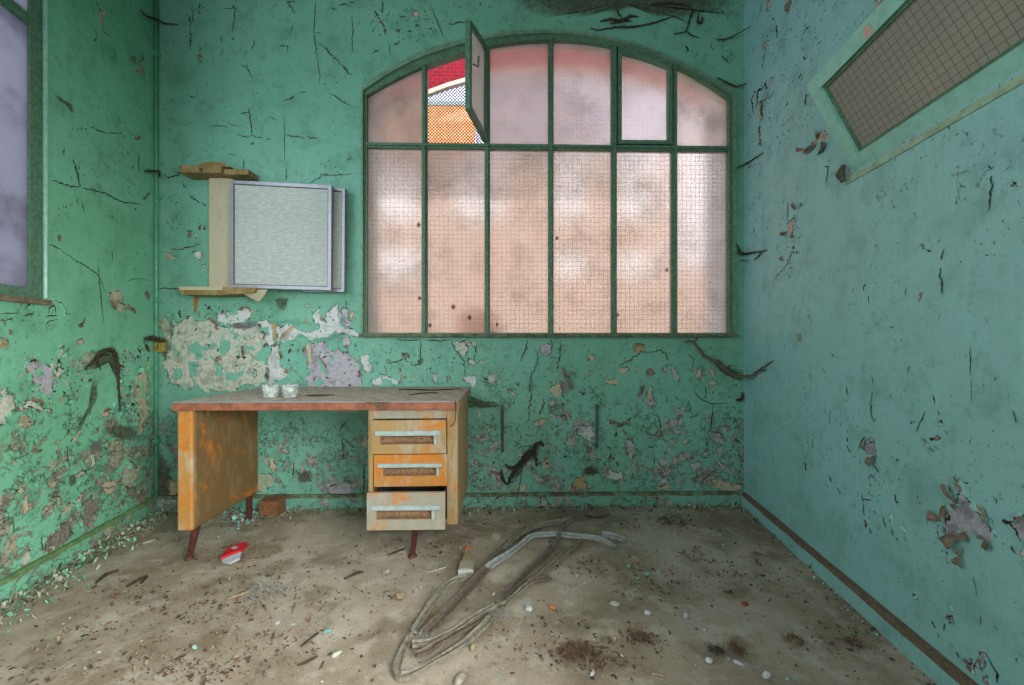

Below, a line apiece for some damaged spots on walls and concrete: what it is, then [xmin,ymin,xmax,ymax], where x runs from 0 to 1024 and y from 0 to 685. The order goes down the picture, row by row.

crack [52,148,142,212]
crack [92,127,207,206]
crack [187,1,464,180]
peeling [747,0,883,260]
crack [49,244,179,322]
peeling [0,295,936,685]
peeling [926,475,1024,569]